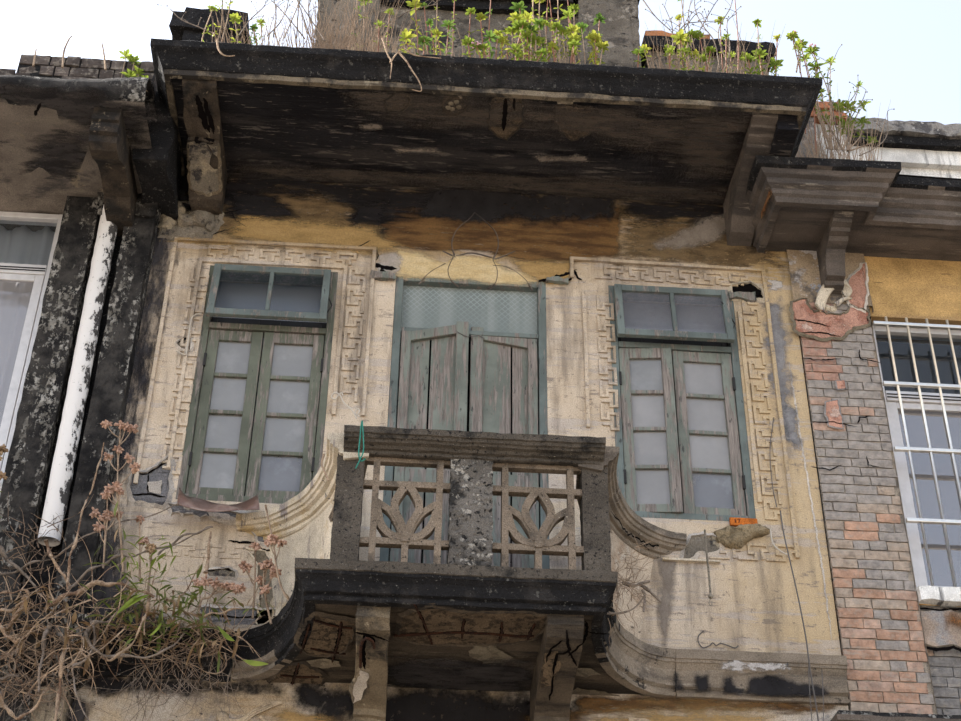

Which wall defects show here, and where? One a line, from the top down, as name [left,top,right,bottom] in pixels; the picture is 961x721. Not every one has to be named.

leakage [217,84,783,270]
spalling [789,262,871,341]
spalling [126,455,251,526]
crack [612,513,659,550]
spalling [197,531,276,629]
crack [355,632,389,669]
crack [546,621,606,701]
leakage [569,672,833,721]
peeling [916,610,961,652]